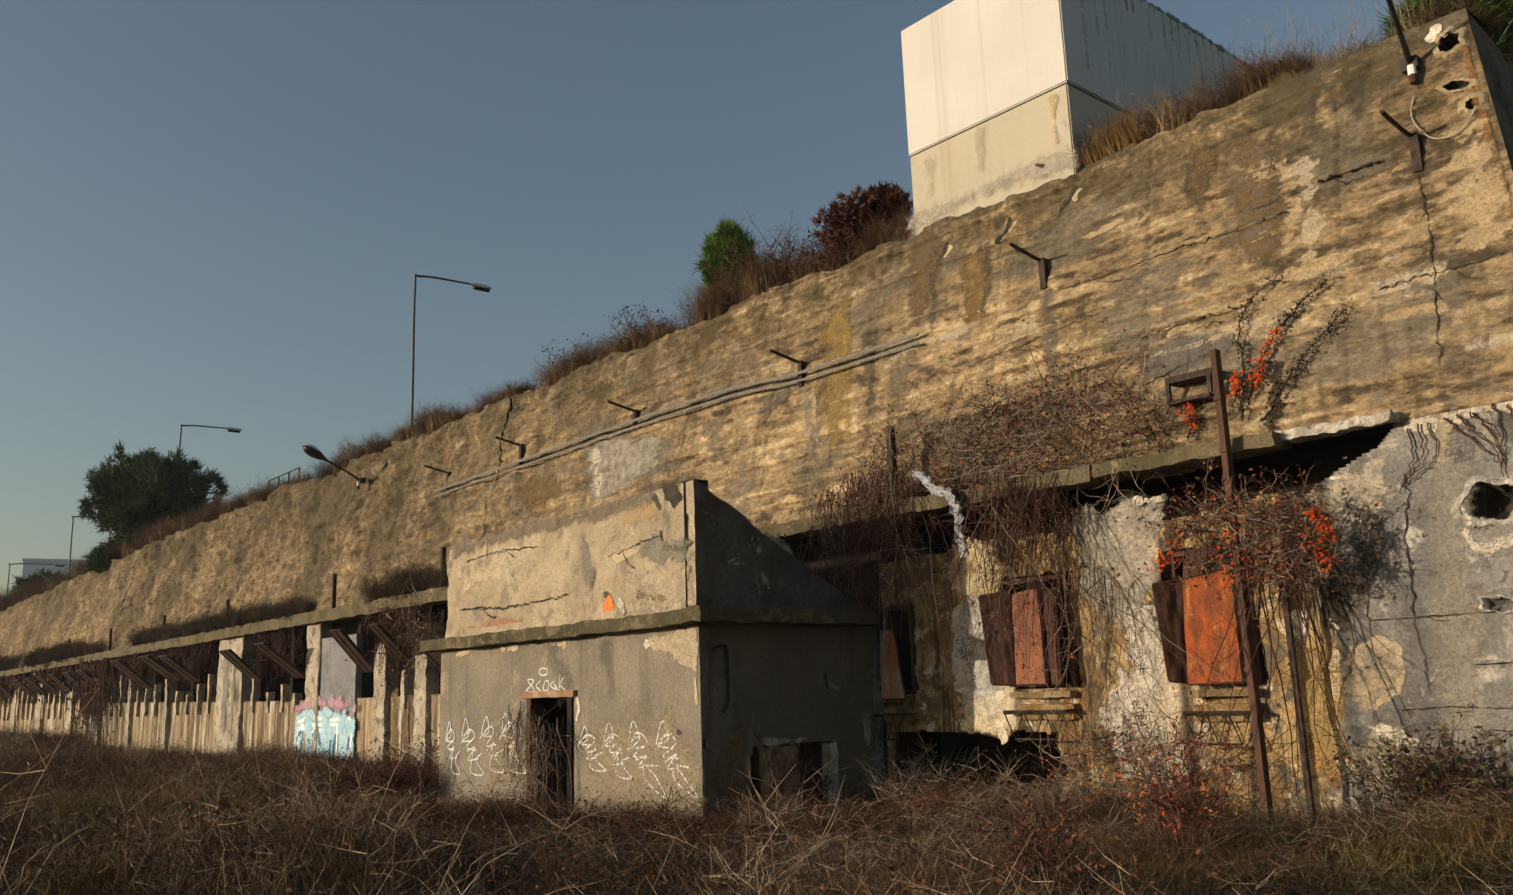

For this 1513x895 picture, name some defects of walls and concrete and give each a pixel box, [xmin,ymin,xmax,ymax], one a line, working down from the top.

damp [907,153,1074,327]
crack [978,160,1380,362]
crack [1379,175,1505,365]
spalling [1452,474,1513,554]
crack [460,593,568,619]
peeling [947,537,1006,721]
spalling [1477,594,1513,615]